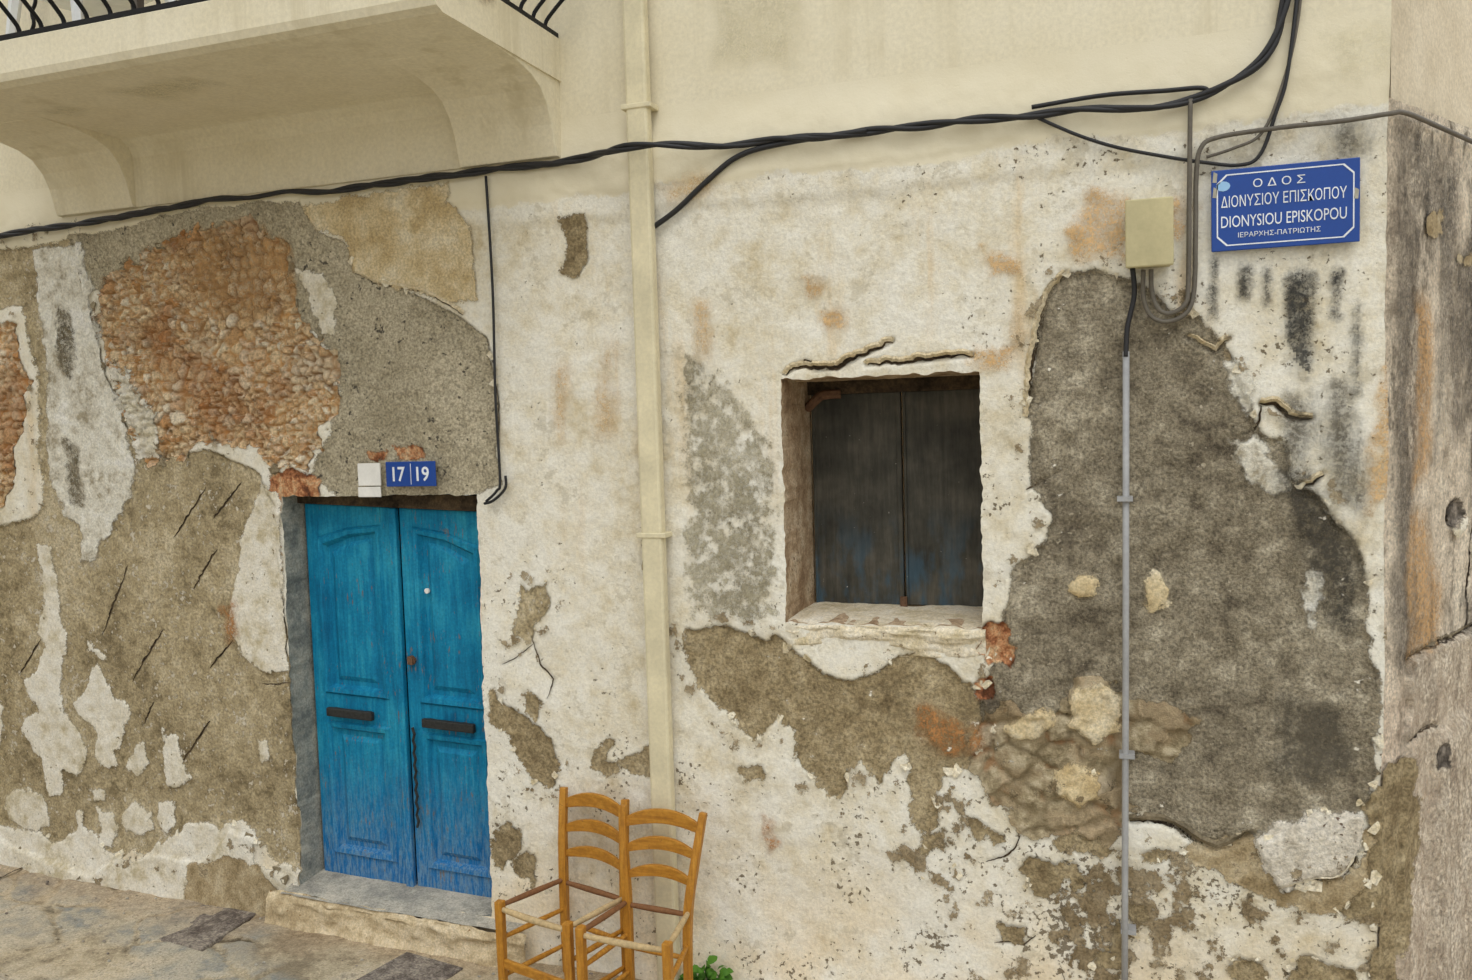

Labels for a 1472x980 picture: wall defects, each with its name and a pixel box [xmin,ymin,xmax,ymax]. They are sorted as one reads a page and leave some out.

peeling [557,213,588,279]
leakage [1209,259,1218,314]
crack [782,336,973,375]
leakage [1223,360,1255,412]
leakage [1239,266,1364,507]
flaking render [0,182,502,916]
flaking render [669,247,1452,980]
leakage [1229,397,1363,633]
leakage [1397,266,1419,666]
crack [1405,528,1472,660]
crack [1411,723,1437,741]
peeling [489,821,538,889]